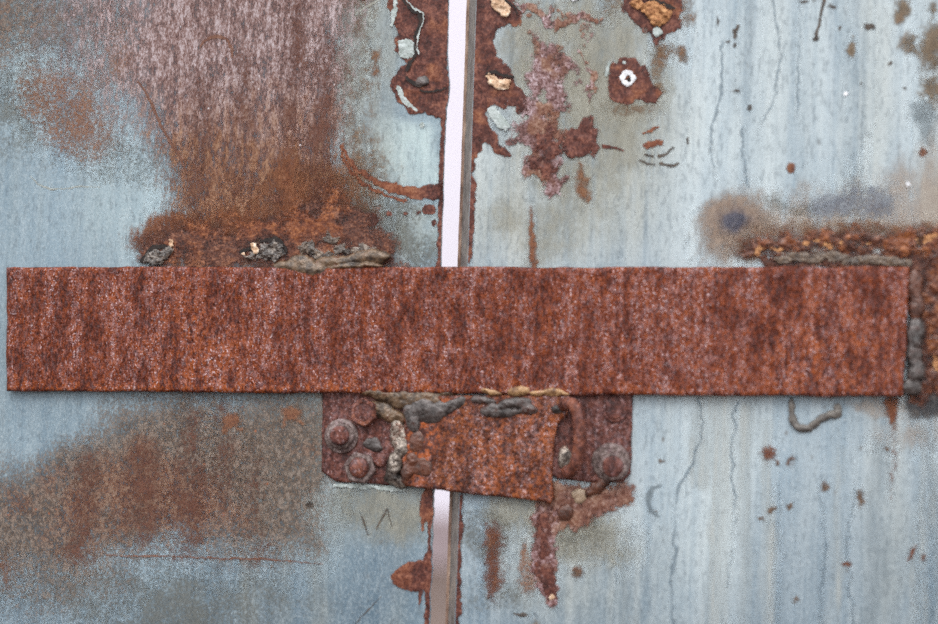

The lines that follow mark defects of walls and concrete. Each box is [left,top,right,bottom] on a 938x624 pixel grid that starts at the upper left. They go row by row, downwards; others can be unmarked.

rust [0,0,446,268]
rust [505,0,667,202]
rust [528,211,538,268]
rust [0,392,335,614]
rust [419,488,434,551]
rust [455,480,636,624]